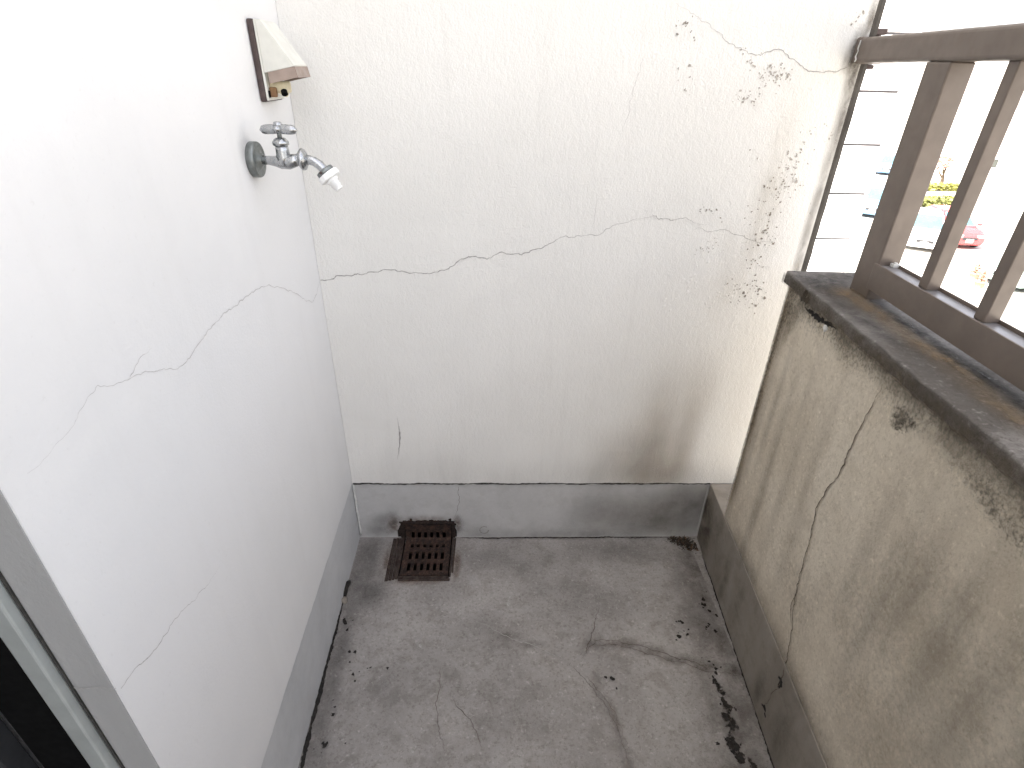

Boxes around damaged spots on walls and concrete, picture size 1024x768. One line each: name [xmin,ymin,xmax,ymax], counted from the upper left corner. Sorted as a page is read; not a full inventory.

crack [678,5,847,73]
crack [27,191,770,474]
damp [891,406,917,430]
crack [763,382,885,708]
crack [476,608,737,763]